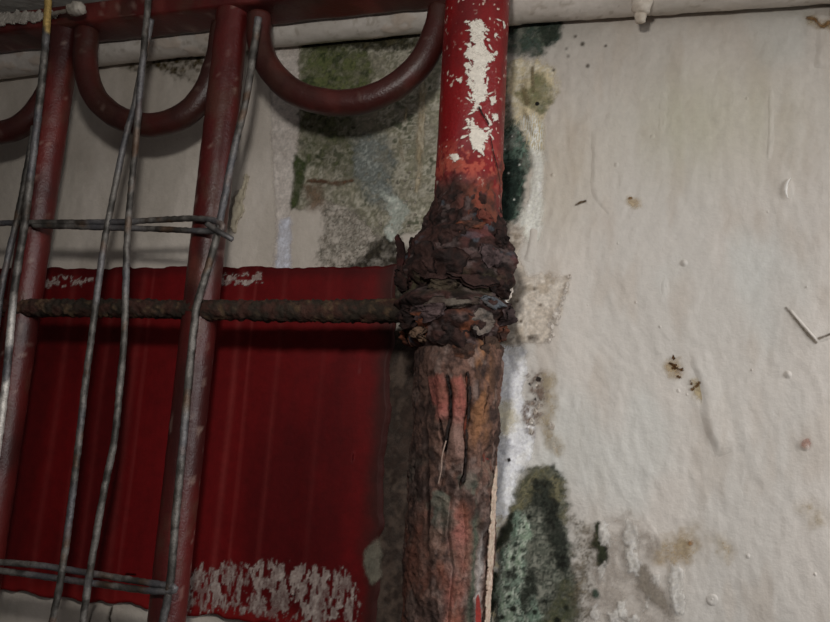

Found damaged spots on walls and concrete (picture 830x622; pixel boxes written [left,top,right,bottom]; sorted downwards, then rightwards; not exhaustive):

leakage [298,34,420,90]
leakage [291,54,442,267]
peeling [456,19,506,156]
leakage [501,21,563,240]
leakage [276,219,291,268]
corrosion [394,234,413,294]
corrosion [398,247,518,359]
corrosion [456,208,510,249]
corrosion [666,355,702,399]
leakage [490,345,608,622]